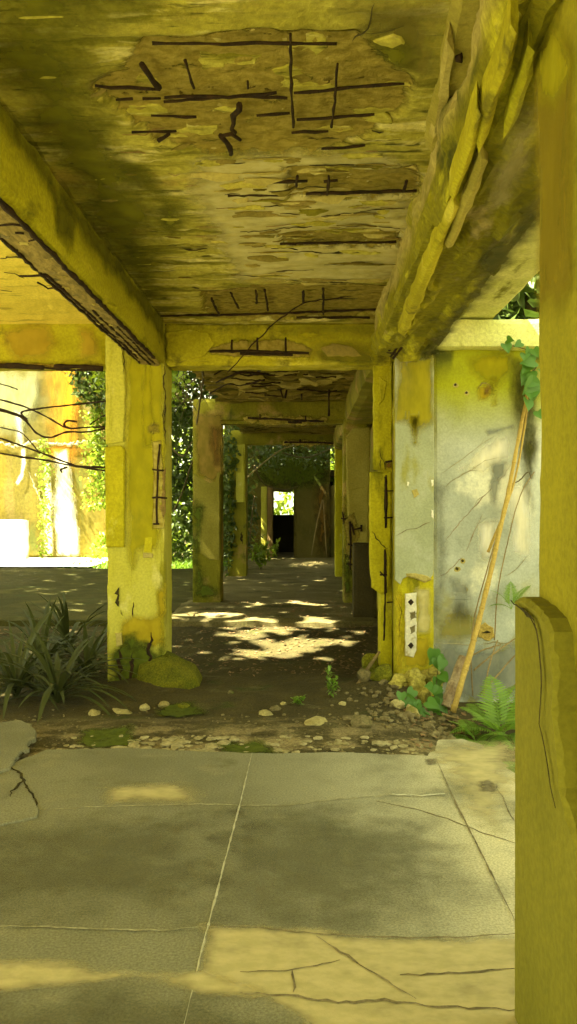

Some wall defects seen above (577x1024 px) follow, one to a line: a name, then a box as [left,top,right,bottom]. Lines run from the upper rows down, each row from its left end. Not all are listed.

spalling [0,27,420,560]
flaking render [341,0,535,641]
water stain [472,355,537,469]
water stain [474,429,505,502]
water stain [481,524,494,556]
water stain [511,487,528,552]
water stain [396,570,515,701]
crack [10,743,136,810]
crack [168,789,515,843]
crack [240,936,515,1011]